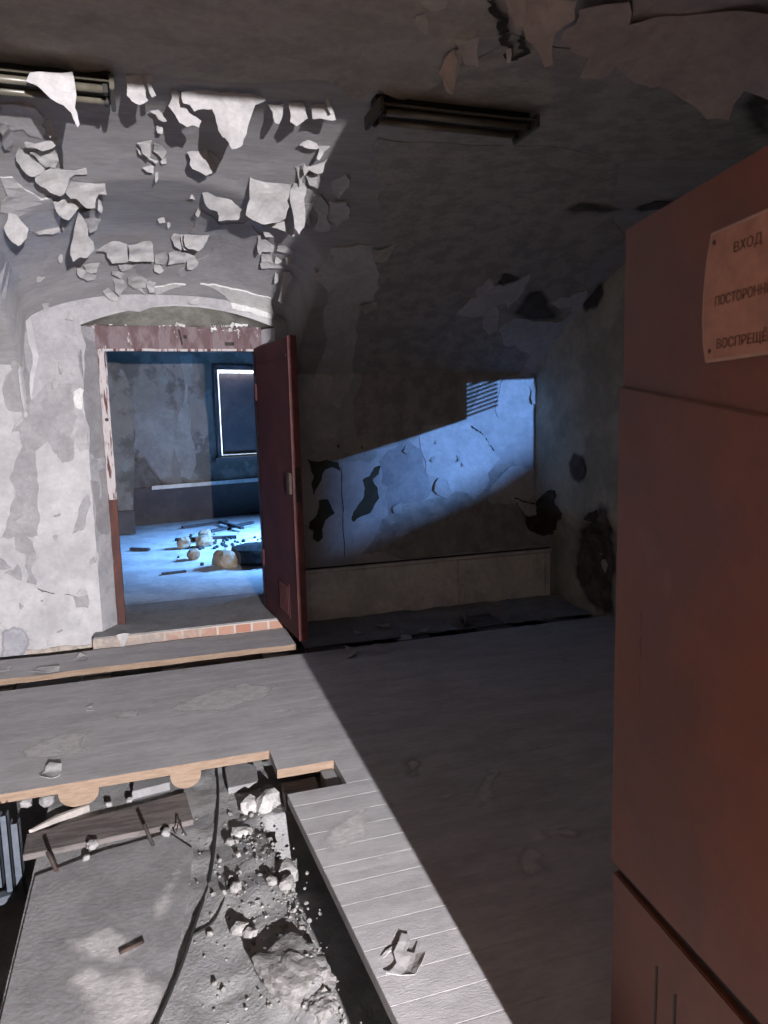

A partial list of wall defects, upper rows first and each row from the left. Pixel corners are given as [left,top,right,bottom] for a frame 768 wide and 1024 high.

peeling [0,0,768,585]
leakage [569,454,586,482]
peeling [73,587,89,608]